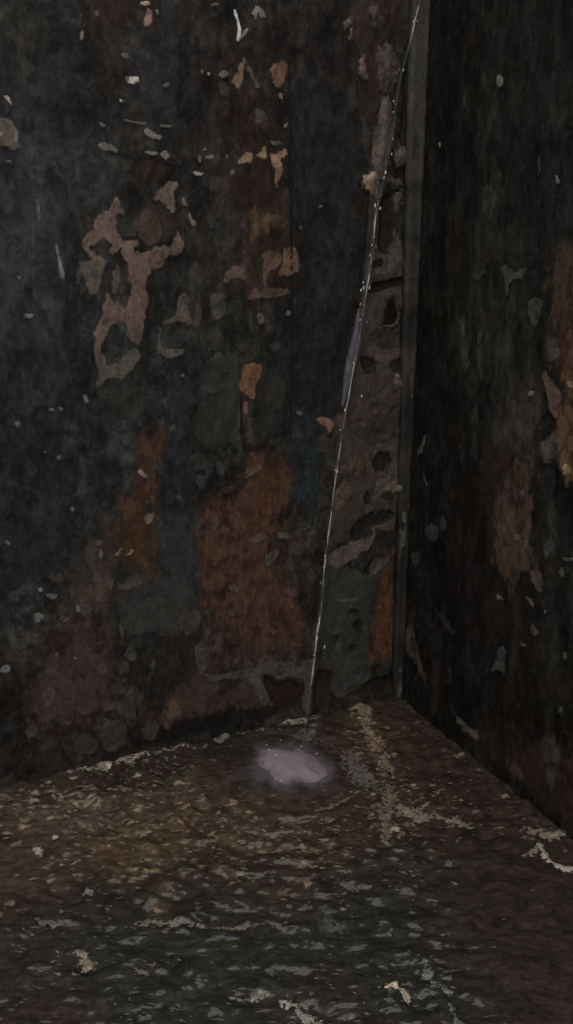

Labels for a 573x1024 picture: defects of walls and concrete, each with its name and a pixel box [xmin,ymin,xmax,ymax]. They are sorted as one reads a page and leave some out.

peeling [201,58,260,96]
peeling [270,61,288,99]
peeling [193,141,287,192]
peeling [76,181,196,387]
peeling [223,246,299,300]
crack [286,59,294,427]
crack [360,190,402,292]
rust [102,424,171,578]
peeling [263,192,402,712]
water stain [398,511,407,567]
water stain [34,586,473,848]